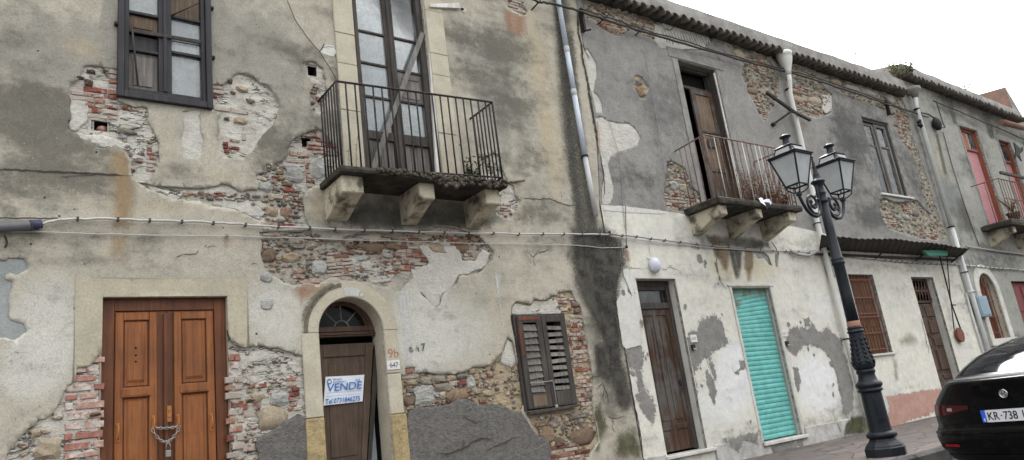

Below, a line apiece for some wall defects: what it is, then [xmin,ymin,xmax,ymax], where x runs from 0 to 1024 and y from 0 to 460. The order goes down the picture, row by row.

spalling [68,66,493,308]
leakage [555,0,632,411]
peeling [584,49,701,214]
spalling [724,42,947,240]
peeling [0,258,28,340]
spalling [5,355,105,460]
spalling [224,340,306,460]
spalling [401,291,597,460]
leakage [595,408,607,450]
peeling [617,268,657,425]
peeling [687,313,731,405]
peeling [786,317,856,419]